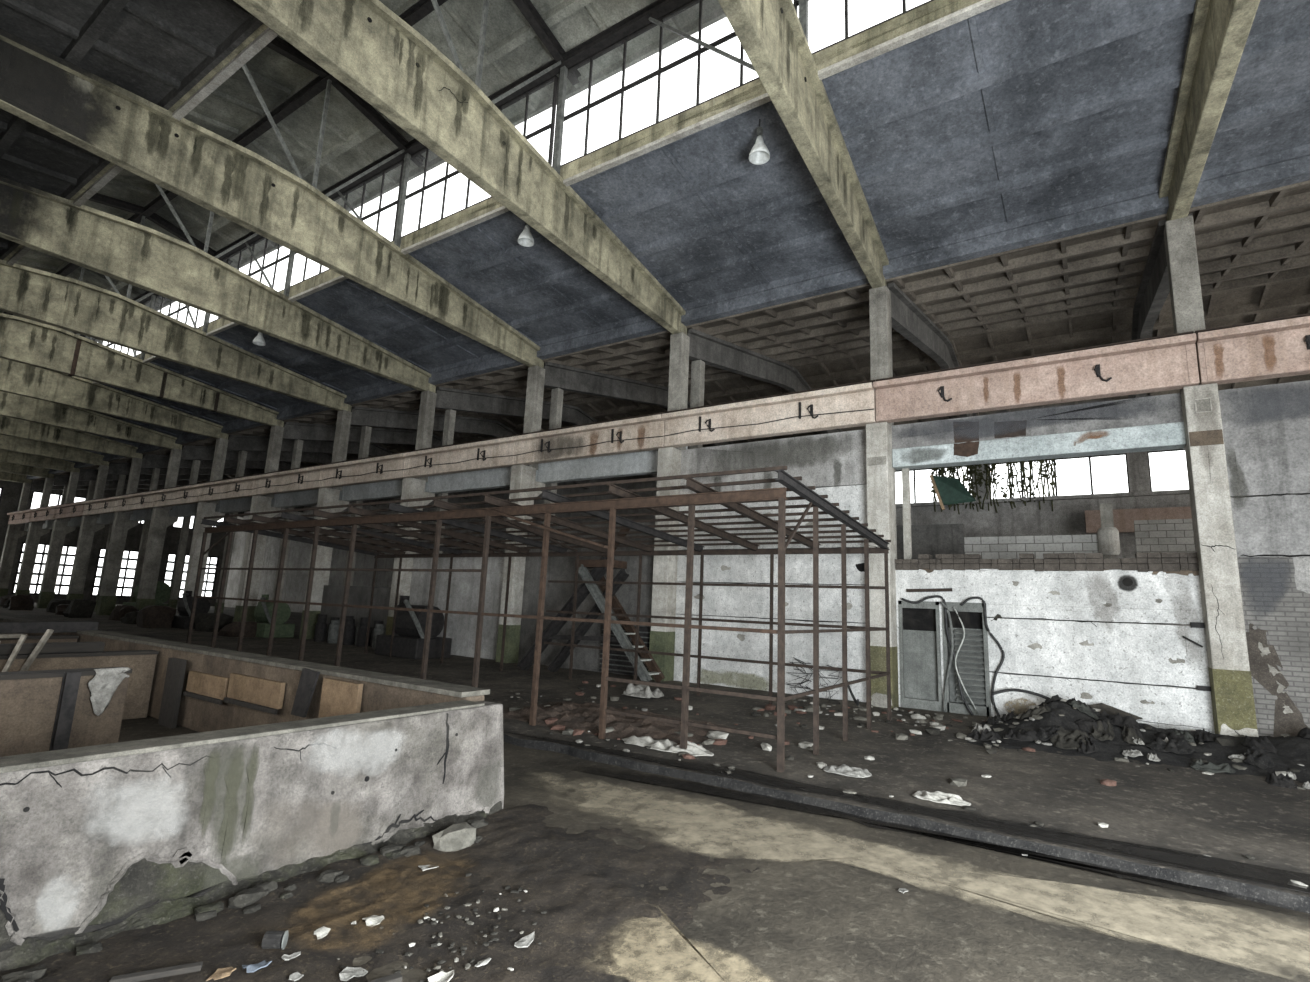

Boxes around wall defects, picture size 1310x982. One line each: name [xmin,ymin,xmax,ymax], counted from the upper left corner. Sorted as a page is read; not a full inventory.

leakage [455,91,469,131]
leakage [191,136,204,174]
leakage [500,131,532,190]
rust [1215,349,1224,372]
rust [1264,338,1275,367]
spalling [1220,620,1310,737]
crack [0,755,221,788]
crack [437,713,449,784]
leakage [201,755,257,853]
crack [362,810,437,845]
spalling [0,890,25,949]
spalling [75,847,238,934]